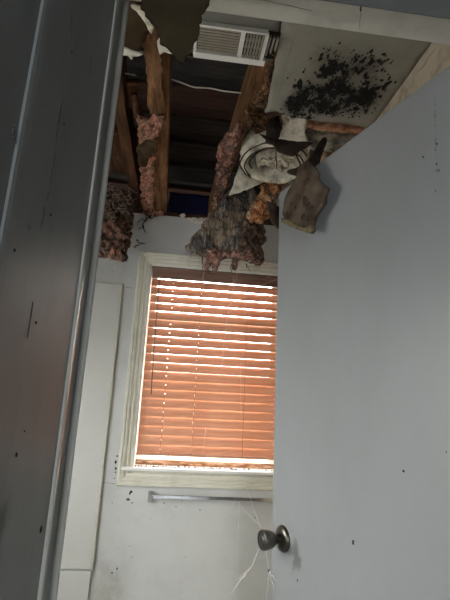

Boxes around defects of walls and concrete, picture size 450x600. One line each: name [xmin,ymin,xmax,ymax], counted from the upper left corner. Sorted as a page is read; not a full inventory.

water stain [277,41,397,120]
peeling [180,214,206,224]